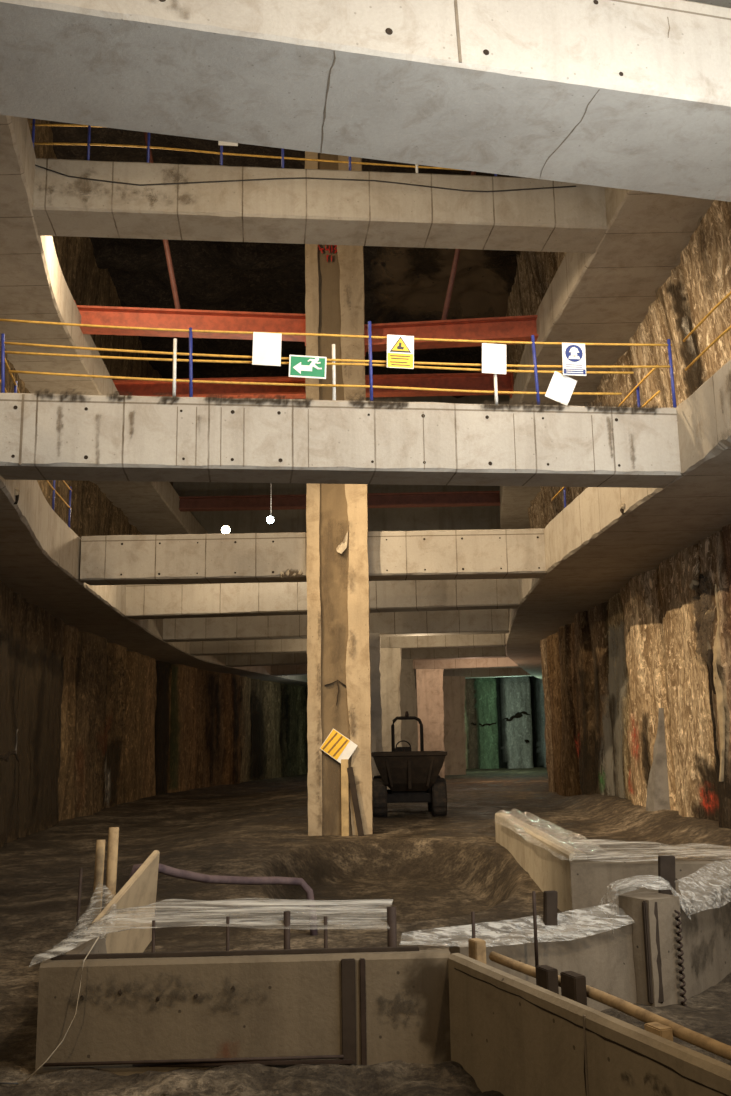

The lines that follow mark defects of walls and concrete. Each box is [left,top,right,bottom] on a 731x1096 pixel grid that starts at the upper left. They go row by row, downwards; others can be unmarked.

crack [471,711,530,743]